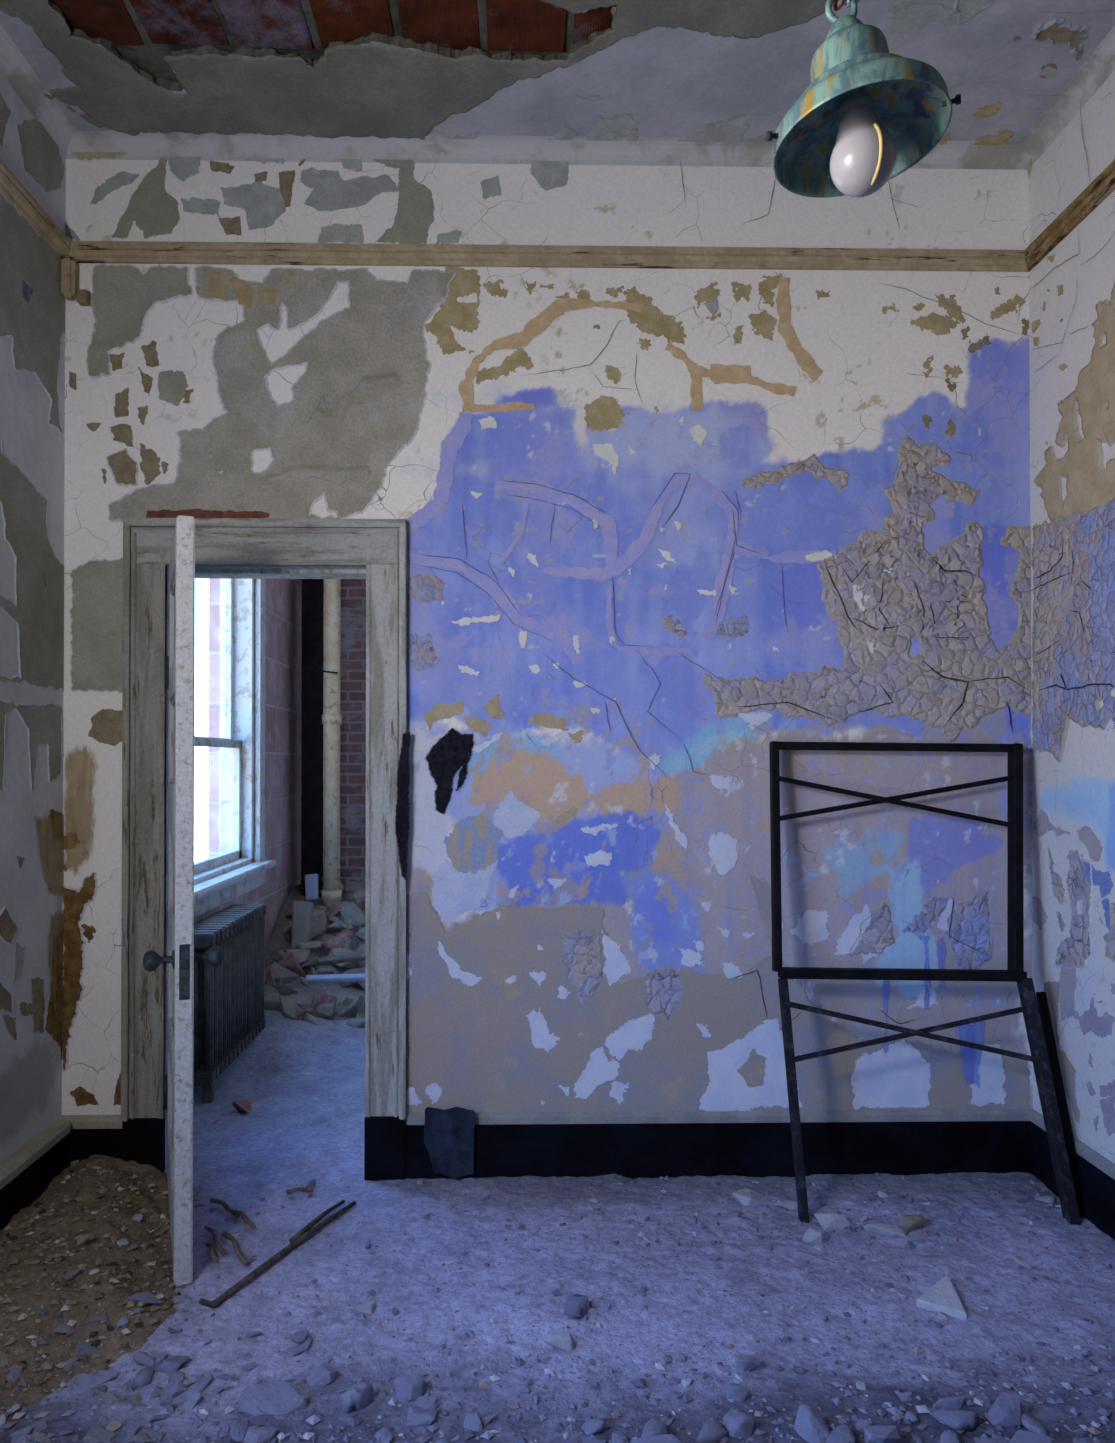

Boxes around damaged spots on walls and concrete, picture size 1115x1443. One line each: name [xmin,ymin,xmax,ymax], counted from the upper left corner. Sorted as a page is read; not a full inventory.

flaking render [0,0,860,142]
peeling [0,193,508,522]
peeling [90,157,462,244]
peeling [525,281,687,351]
peeling [584,365,636,474]
peeling [694,273,783,345]
peeling [882,285,1063,353]
peeling [1034,283,1115,523]
peeling [0,428,123,793]
peeling [0,836,98,1072]
peeling [407,791,1032,1113]
peeling [1032,809,1115,1136]